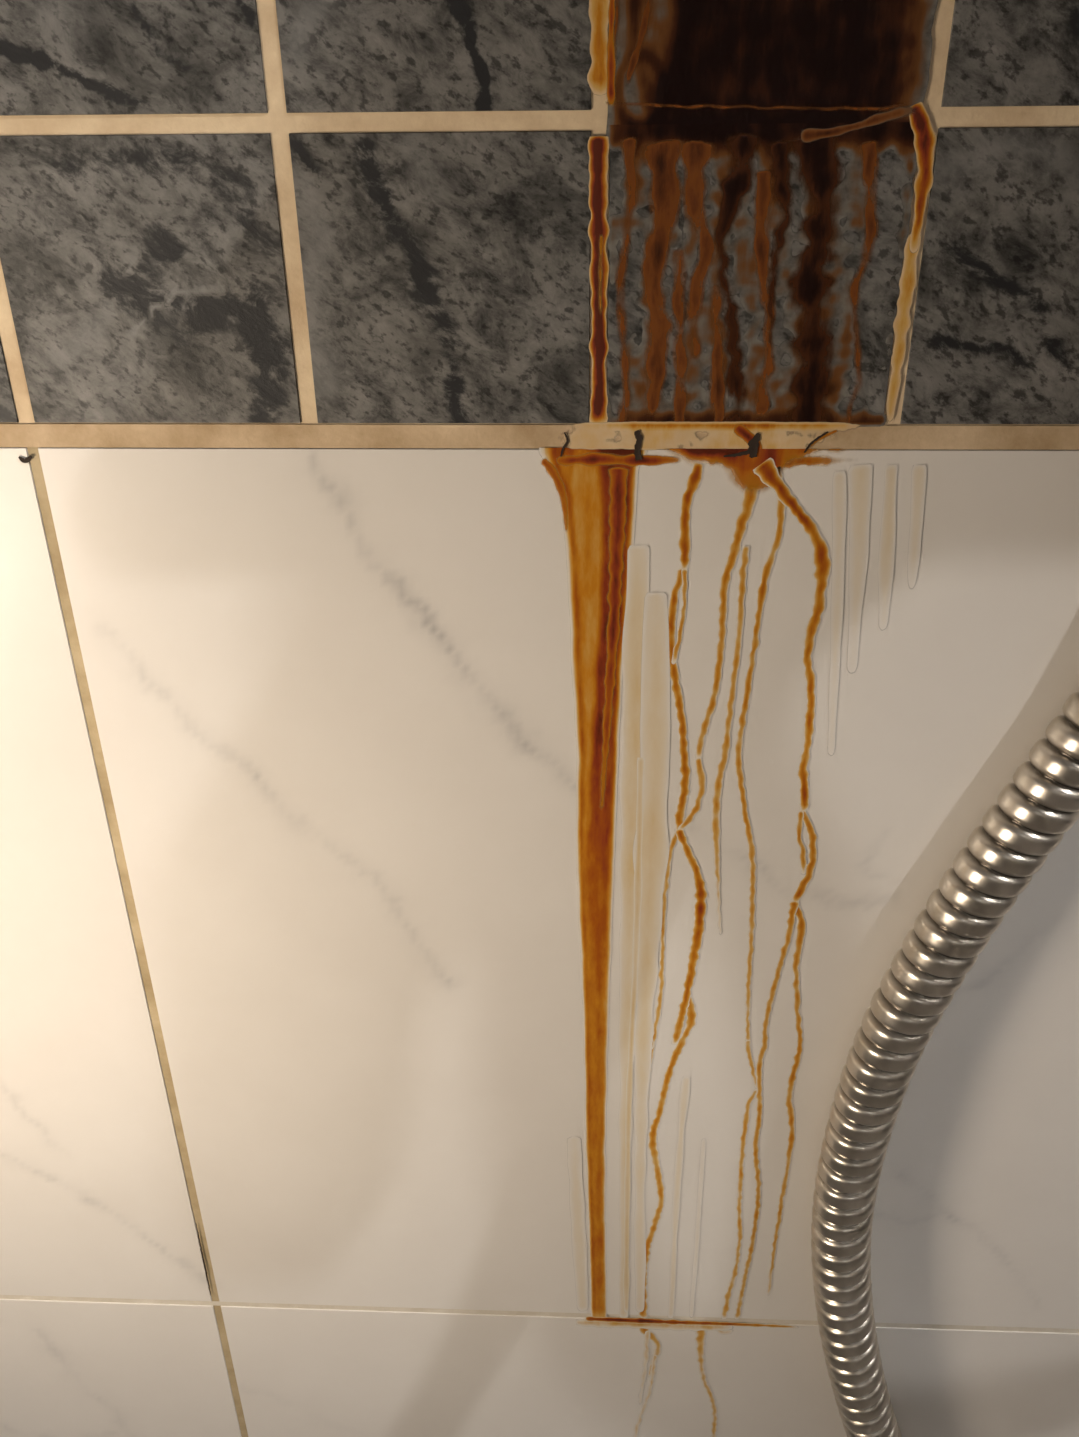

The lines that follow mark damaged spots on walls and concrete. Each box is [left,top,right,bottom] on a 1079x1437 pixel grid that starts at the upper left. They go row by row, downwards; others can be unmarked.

corrosion [539,0,938,1437]